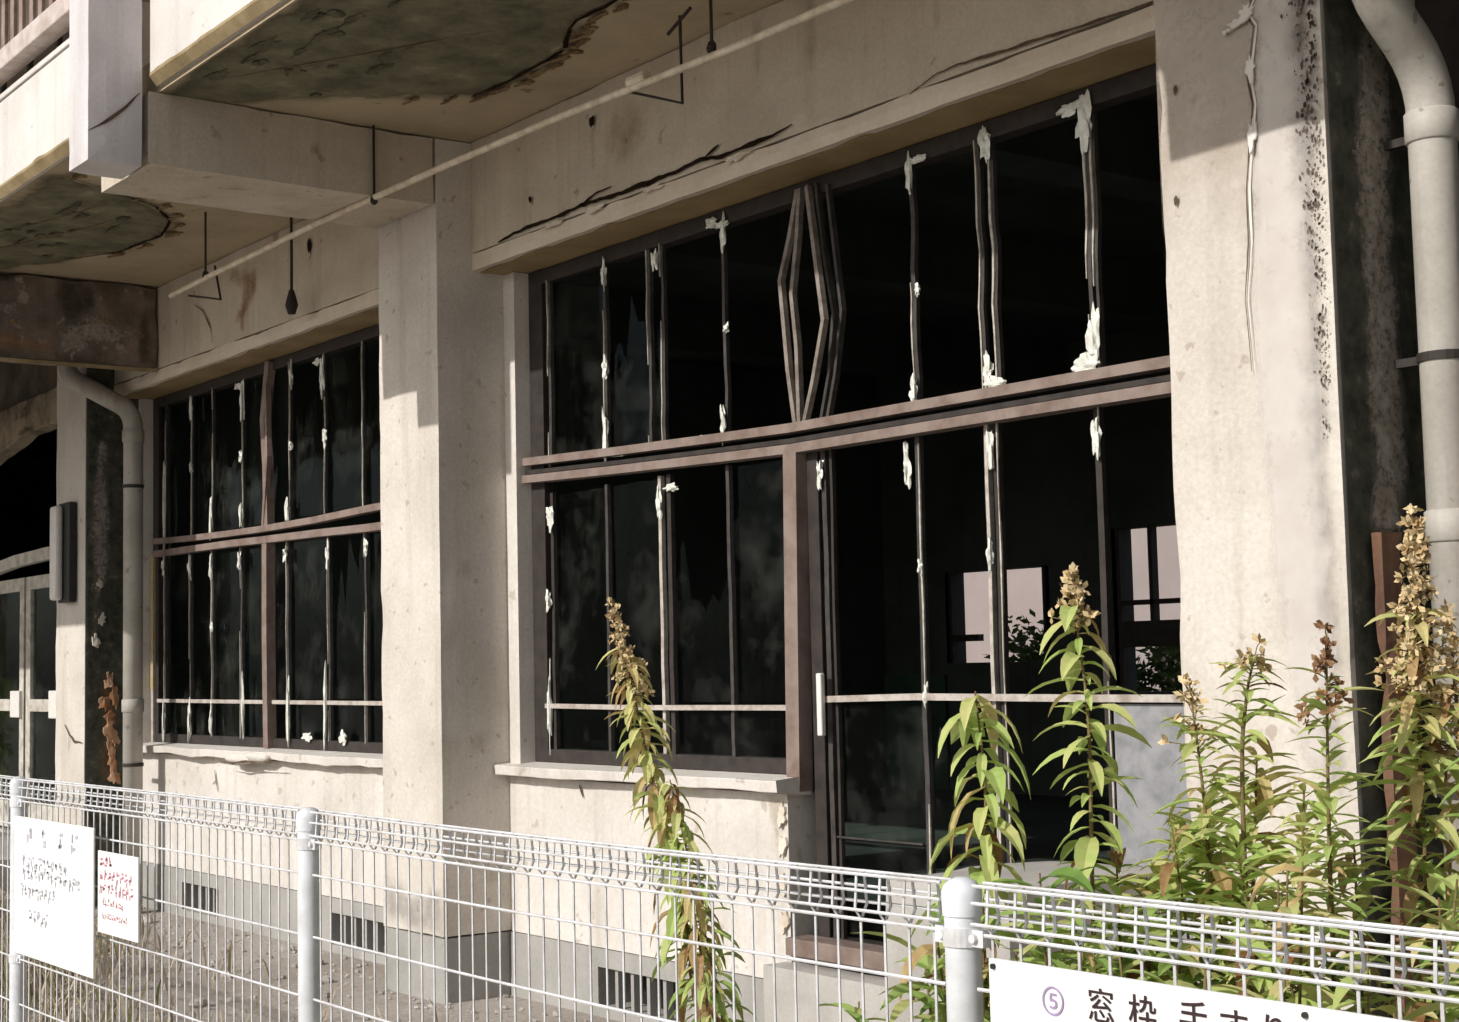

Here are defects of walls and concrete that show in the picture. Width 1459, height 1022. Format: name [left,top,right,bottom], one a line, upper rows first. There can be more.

flaking render [169,0,629,105]
crack [909,0,1154,95]
flaking render [0,173,186,269]
crack [498,124,792,243]
water stain [1280,0,1329,439]